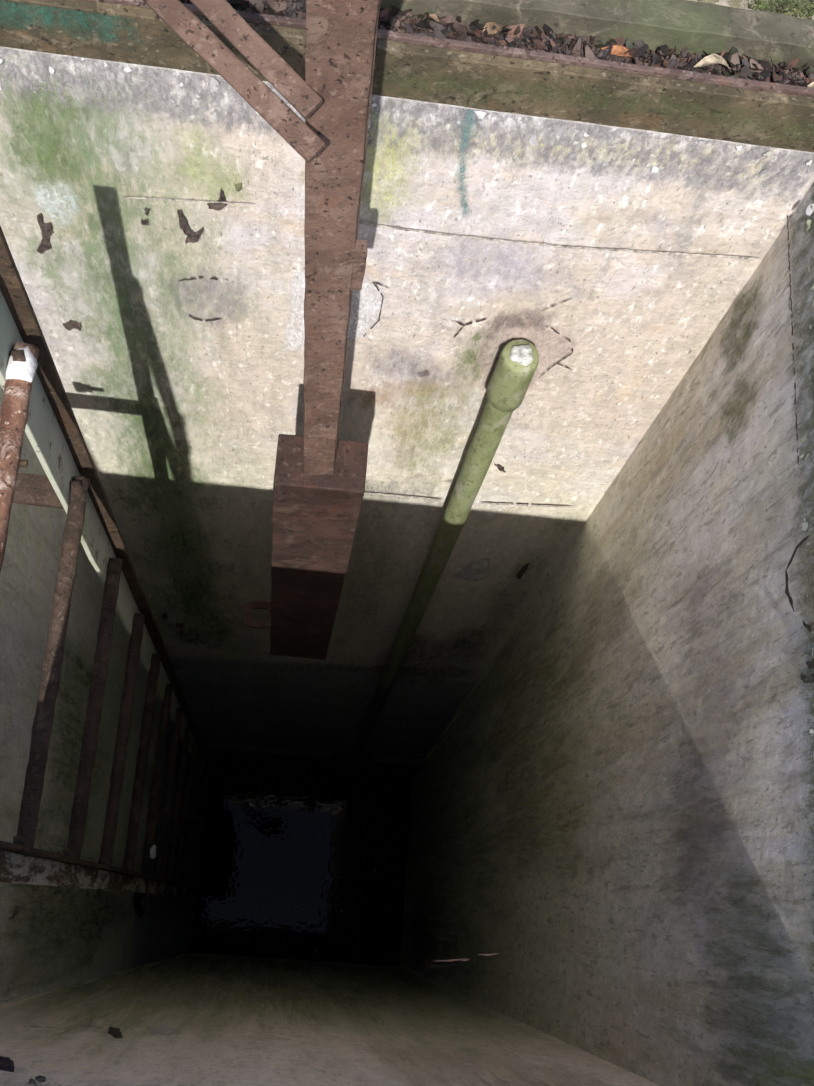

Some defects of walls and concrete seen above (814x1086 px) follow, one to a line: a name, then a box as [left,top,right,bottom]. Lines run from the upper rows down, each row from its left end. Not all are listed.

peeling [207,182,242,211]
peeling [37,189,75,254]
peeling [177,209,203,244]